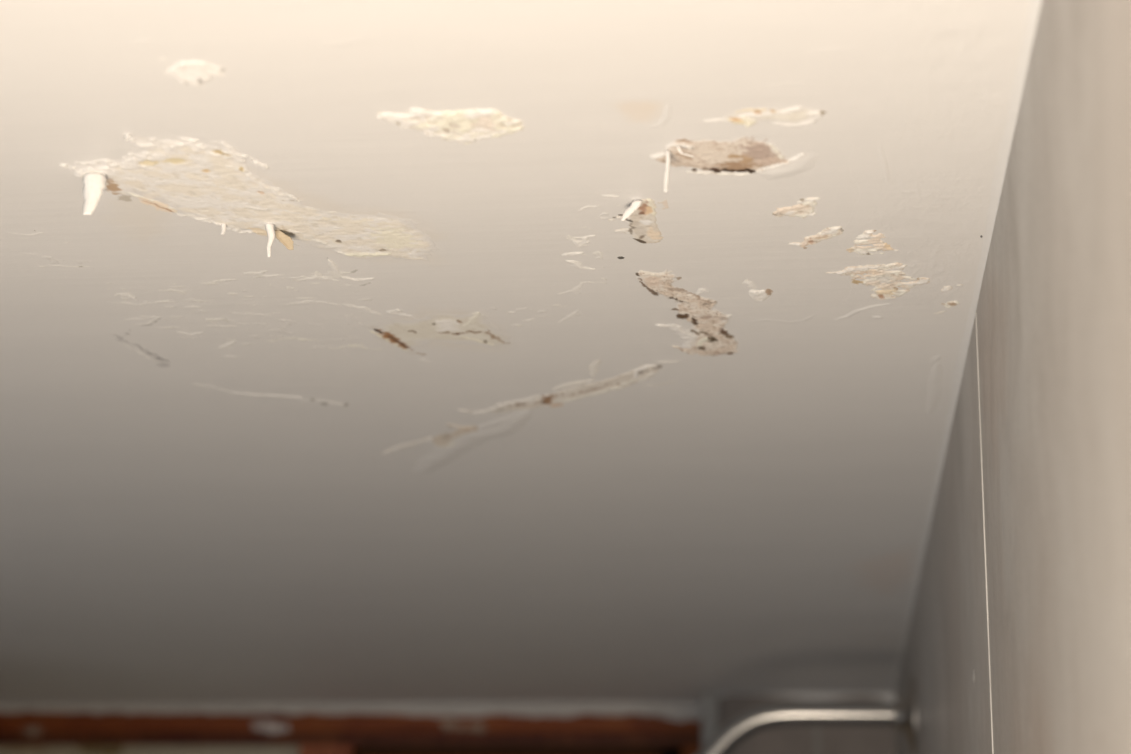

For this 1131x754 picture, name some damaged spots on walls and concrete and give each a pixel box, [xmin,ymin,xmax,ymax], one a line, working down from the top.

peeling [159,58,227,86]
peeling [376,108,524,145]
peeling [59,131,439,286]
spalling [607,106,827,243]
peeling [363,308,512,363]
spalling [635,269,740,356]